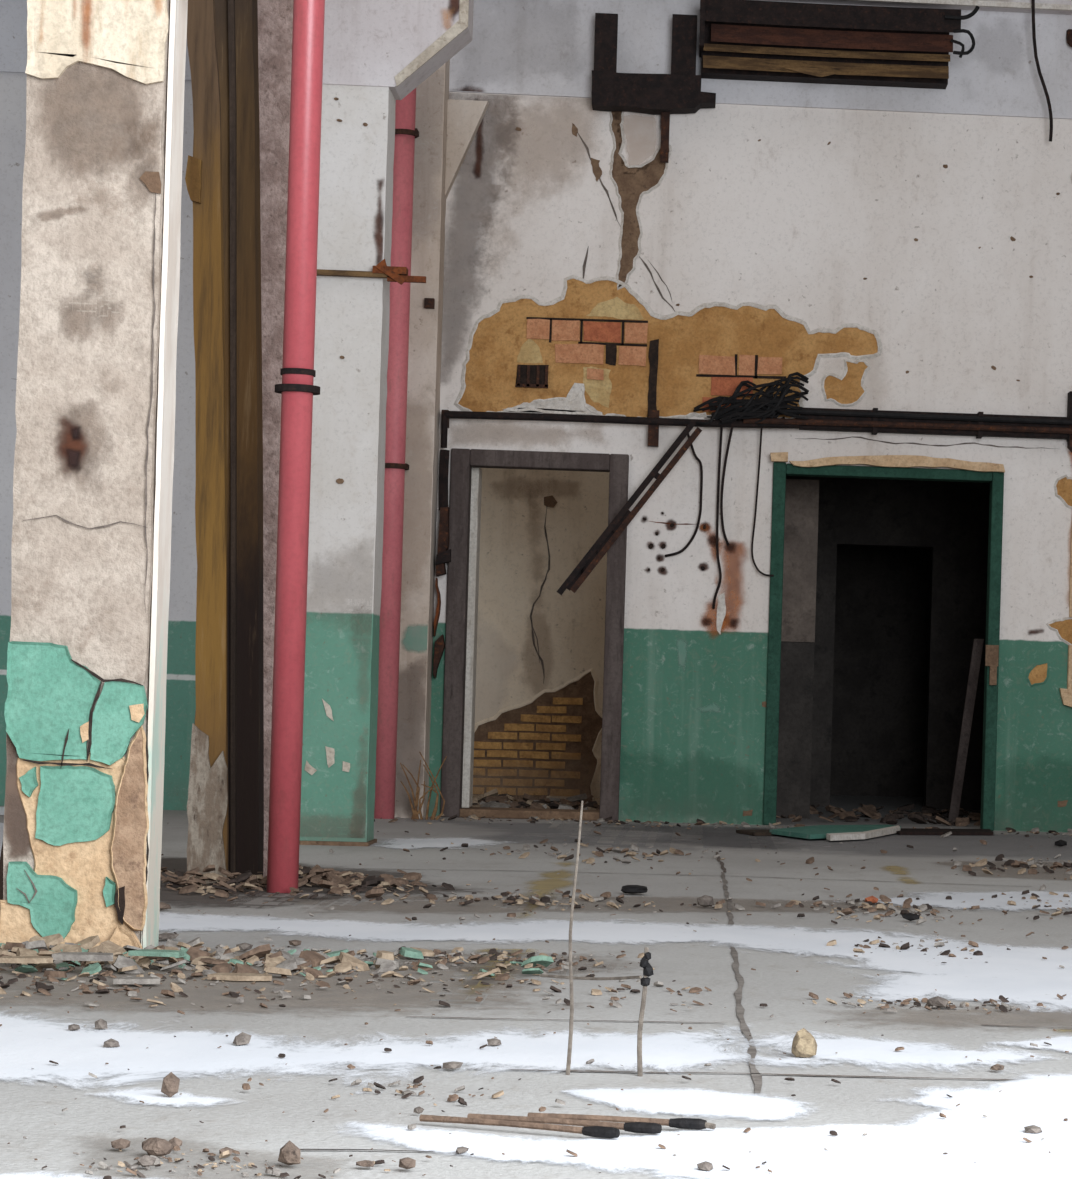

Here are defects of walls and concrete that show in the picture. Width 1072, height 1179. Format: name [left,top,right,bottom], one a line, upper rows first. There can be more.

peeling [25,0,169,85]
peeling [454,111,882,419]
corrosion [59,420,87,469]
peeling [1054,474,1072,509]
corrosion [699,523,743,634]
peeling [1046,617,1072,645]
flaking render [473,668,602,800]
peeling [0,641,149,956]